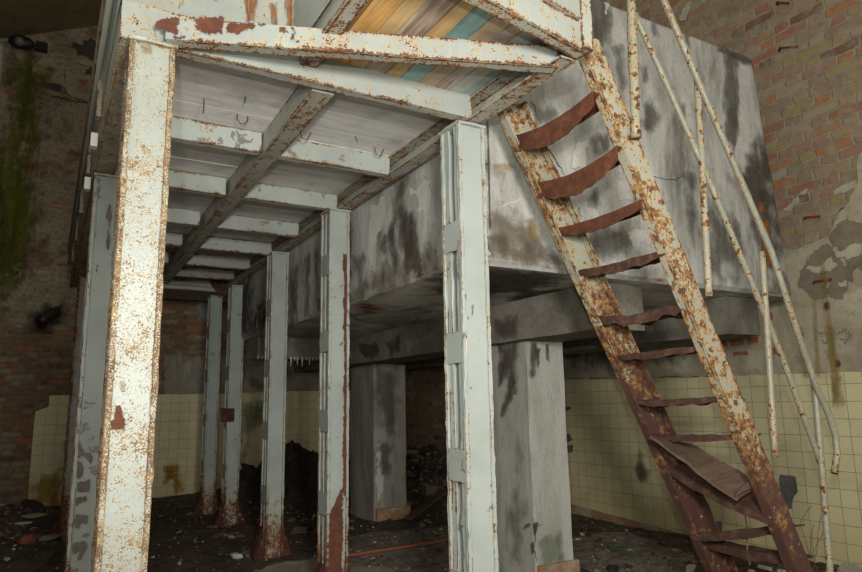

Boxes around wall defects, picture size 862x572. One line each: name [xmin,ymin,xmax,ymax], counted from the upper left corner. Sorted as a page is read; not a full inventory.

rust [155,4,186,39]
rust [193,0,299,42]
damp [591,0,610,44]
damp [719,46,753,145]
damp [354,180,443,297]
damp [488,215,565,301]
damp [710,210,743,272]
rust [759,201,772,267]
damp [743,141,808,268]
peeling [775,219,862,300]
rust [111,405,126,429]
rust [329,236,351,572]